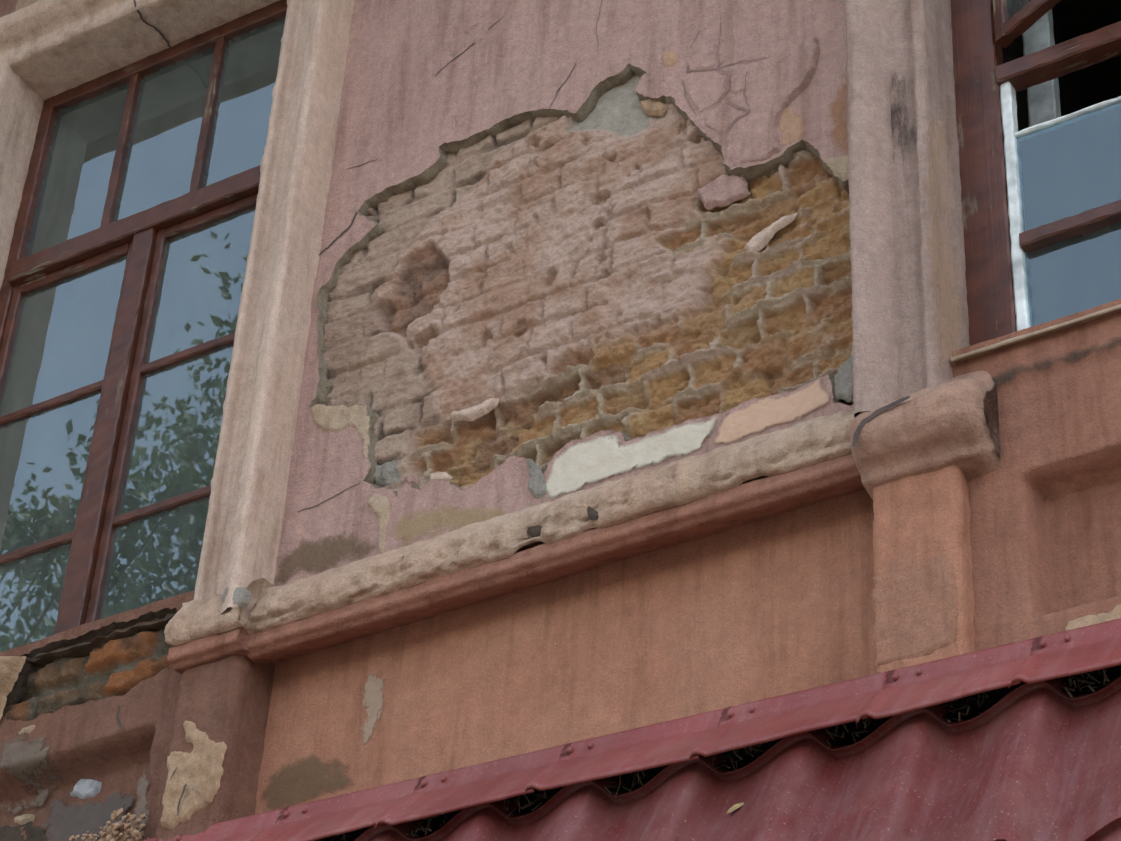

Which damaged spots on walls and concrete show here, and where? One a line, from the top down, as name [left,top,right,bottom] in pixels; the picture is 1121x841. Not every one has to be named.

crack [133,0,172,48]
crack [681,16,770,138]
flaking render [309,63,853,499]
flaking render [0,608,178,841]
flaking render [130,721,227,832]
peeling [361,672,384,748]